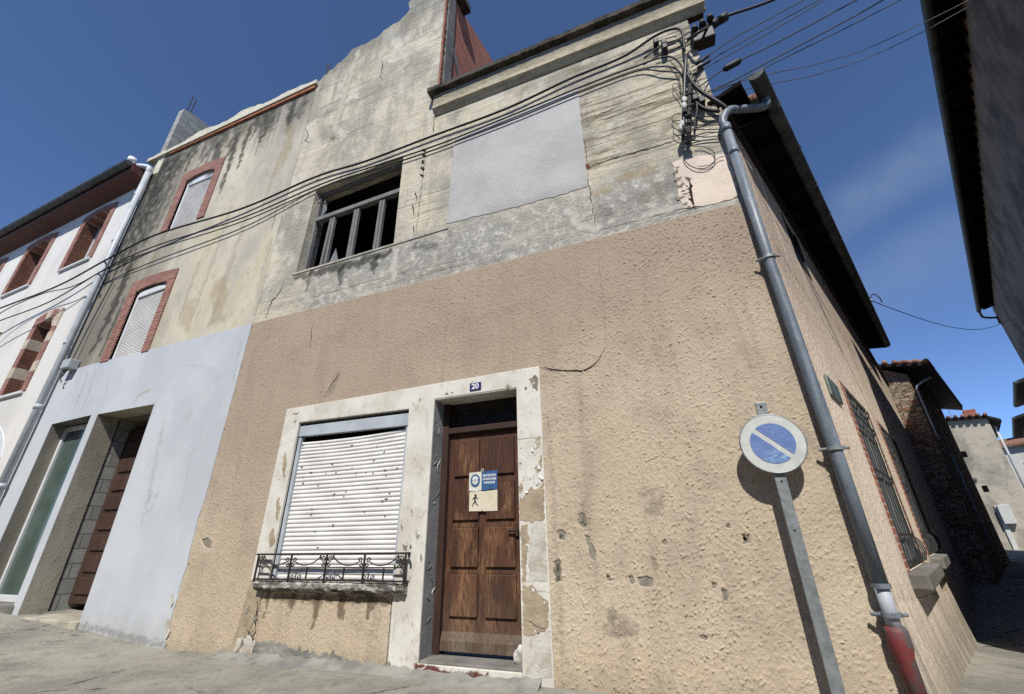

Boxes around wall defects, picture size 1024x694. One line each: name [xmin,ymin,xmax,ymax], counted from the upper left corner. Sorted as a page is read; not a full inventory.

leakage [202,108,275,191]
crack [412,150,426,231]
peeling [671,154,738,208]
crack [543,139,679,372]
peeling [519,436,566,679]
spalling [578,513,596,561]
spalling [629,576,653,587]
spalling [233,602,258,654]